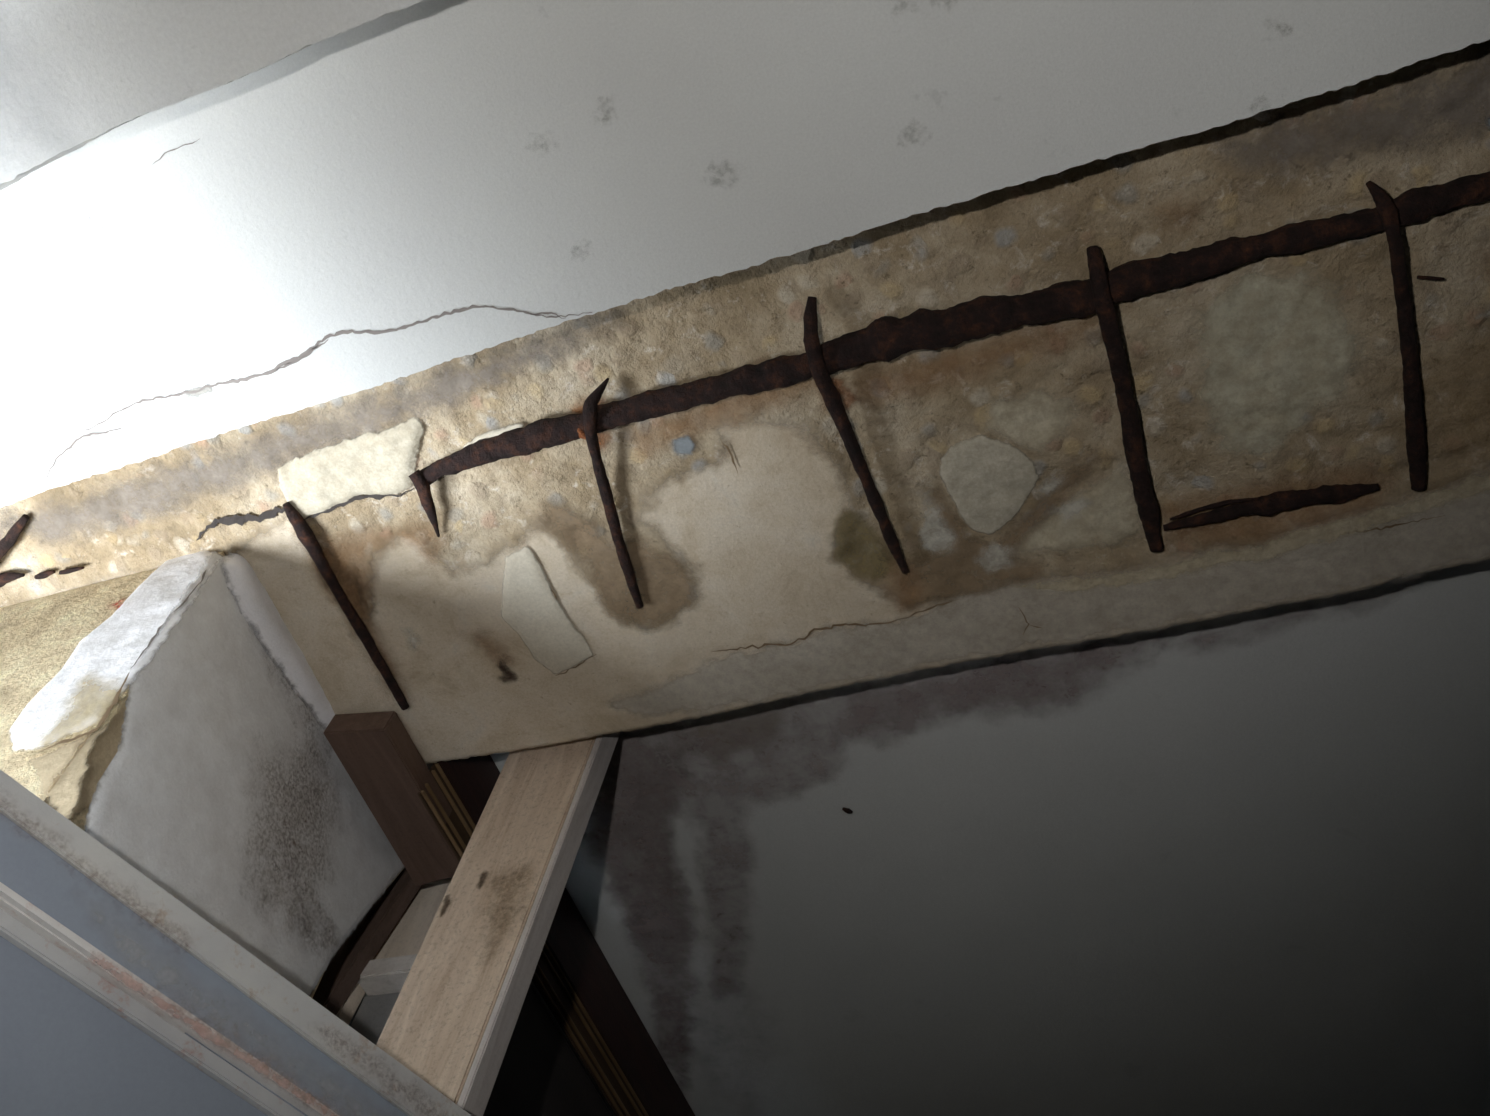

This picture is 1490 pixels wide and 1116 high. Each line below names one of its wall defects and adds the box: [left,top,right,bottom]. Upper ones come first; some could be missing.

crack [46,305,592,479]
corrosion [574,400,604,448]
spalling [0,40,1490,674]
damp [546,505,691,625]
damp [836,465,1091,606]
corrosion [1170,497,1260,521]
spalling [30,689,130,819]
damp [592,643,1135,1052]